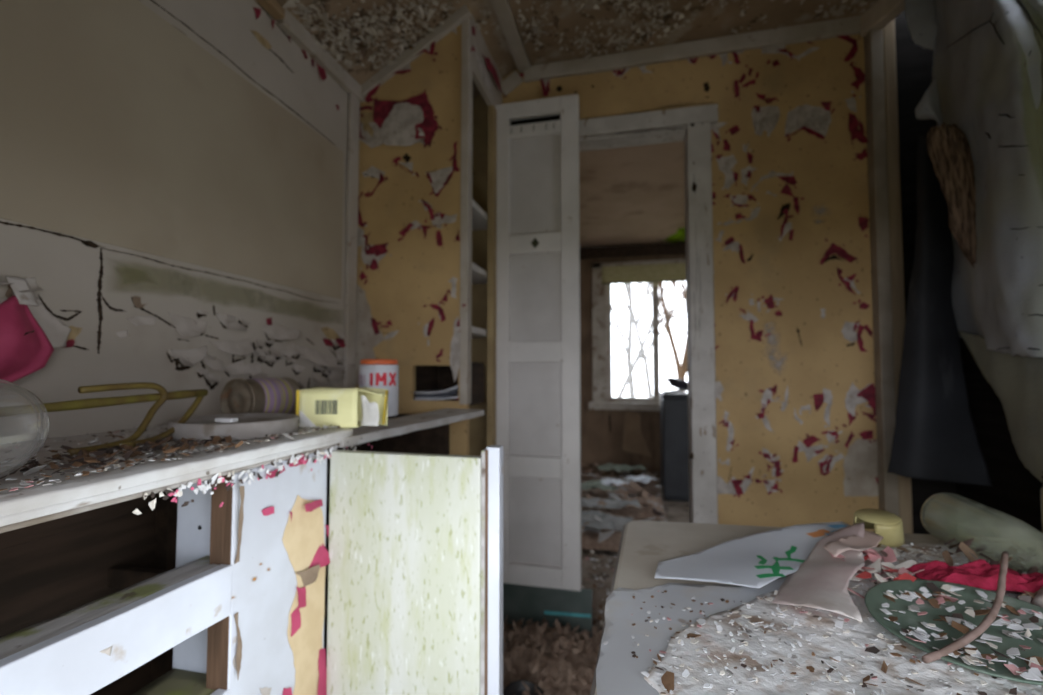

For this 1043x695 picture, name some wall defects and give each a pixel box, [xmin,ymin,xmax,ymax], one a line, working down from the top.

peeling [515,0,767,60]
peeling [732,48,795,112]
peeling [0,275,89,350]
crack [0,221,336,354]
peeling [105,141,460,390]
peeling [726,286,770,342]
peeling [757,294,783,316]
peeling [819,238,873,352]
peeling [731,384,879,498]
peeling [132,435,401,564]
peeling [233,612,242,679]
peeling [260,495,331,695]